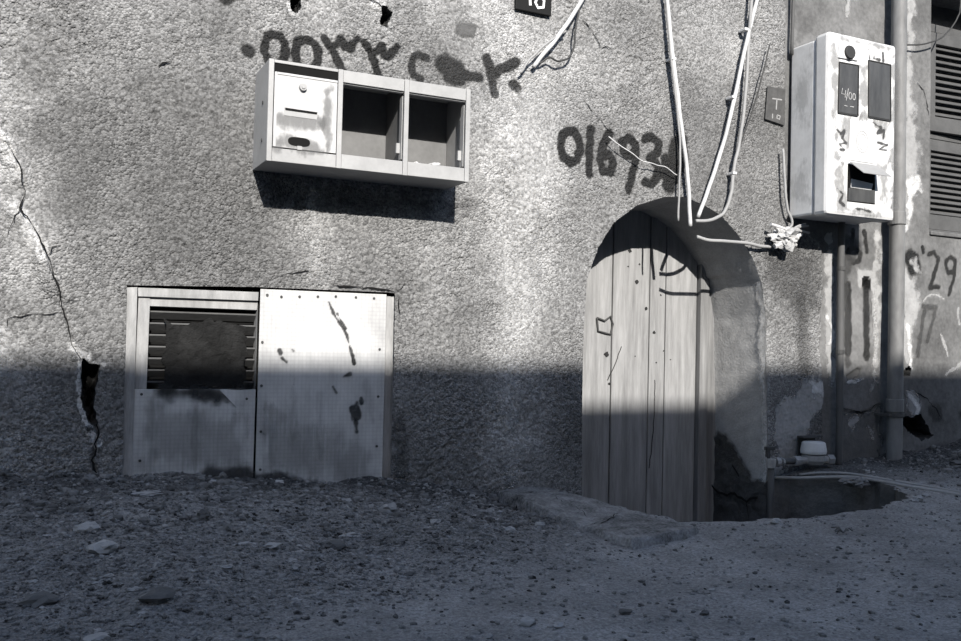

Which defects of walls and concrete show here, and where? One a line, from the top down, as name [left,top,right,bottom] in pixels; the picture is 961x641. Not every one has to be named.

crack [0,127,91,361]
spalling [75,352,106,428]
crack [82,424,102,473]
spalling [903,390,933,441]